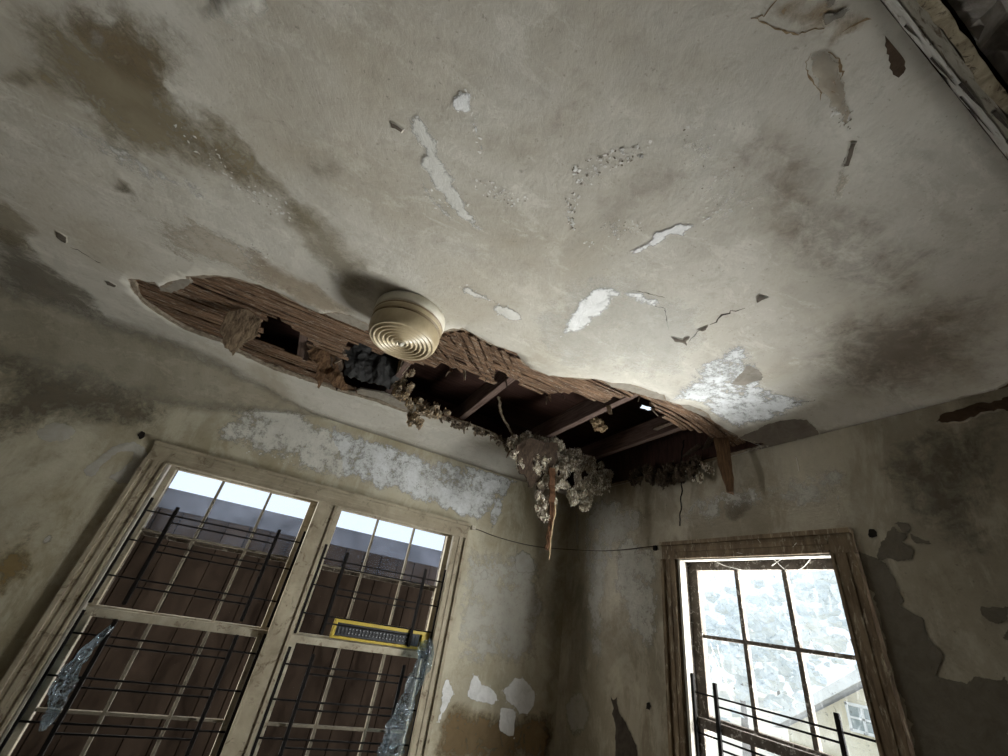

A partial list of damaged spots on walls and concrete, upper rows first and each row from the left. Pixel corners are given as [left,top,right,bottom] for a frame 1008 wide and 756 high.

leakage [35,16,280,190]
peeling [389,116,481,230]
peeling [631,192,753,253]
peeling [564,287,658,333]
crack [632,290,769,346]
leakage [0,358,153,433]
peeling [676,347,820,453]
flaking render [936,396,1008,424]
peeling [220,409,516,525]
peeling [859,522,1008,756]
peeling [437,679,455,723]
peeling [468,673,537,738]